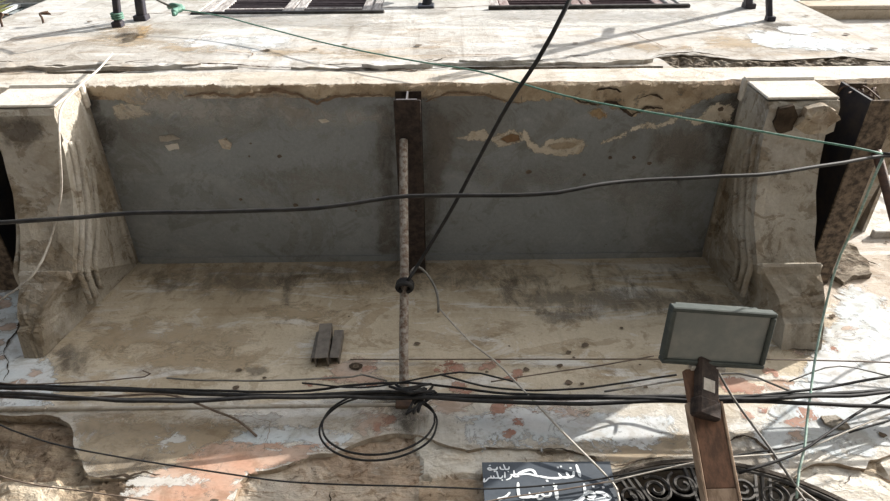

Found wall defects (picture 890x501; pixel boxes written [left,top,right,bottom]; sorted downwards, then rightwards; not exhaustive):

spalling [451,13,890,70]
leakage [707,36,771,48]
spalling [43,70,740,117]
peeling [870,214,890,229]
crack [3,322,20,380]
spalling [0,290,679,501]
peeling [719,235,890,501]